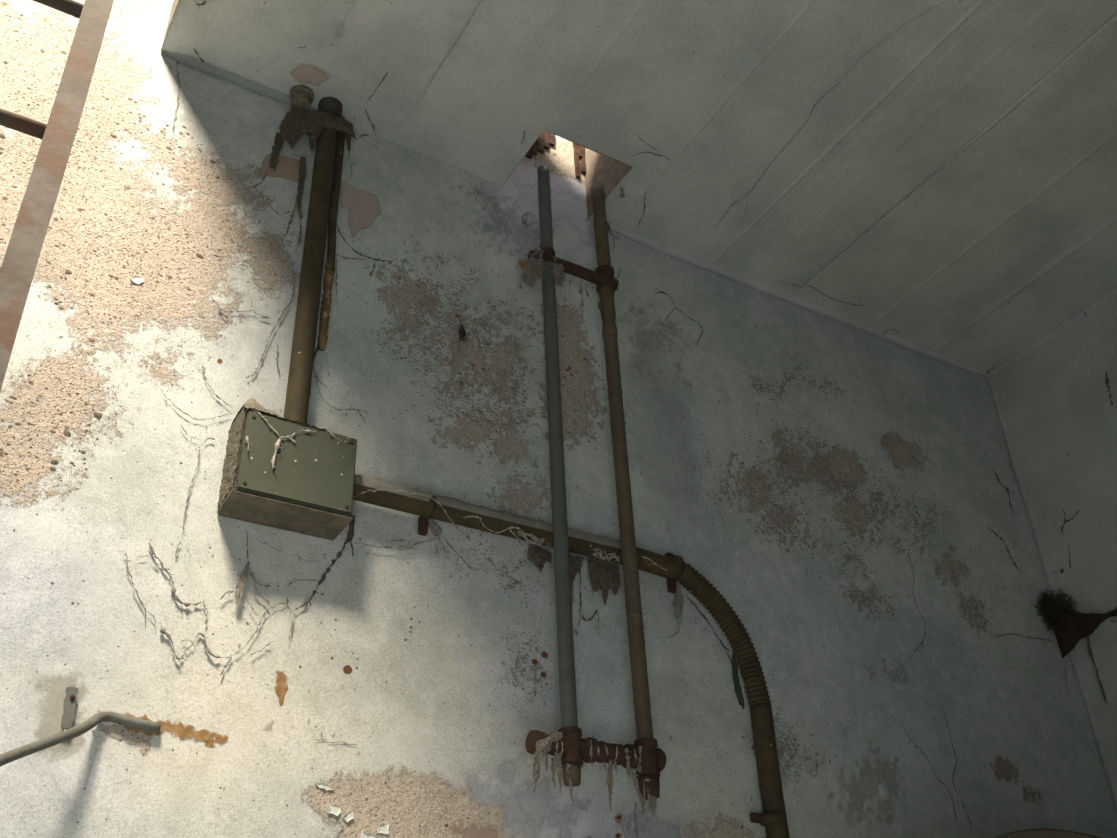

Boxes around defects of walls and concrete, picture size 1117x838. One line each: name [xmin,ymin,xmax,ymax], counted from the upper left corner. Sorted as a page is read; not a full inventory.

crack [717,3,943,226]
flaking render [0,0,299,508]
flaking render [354,230,609,478]
flaking render [700,358,993,639]
rust [125,713,228,748]
rust [274,671,288,706]
peeling [301,765,513,838]
crack [900,714,972,831]